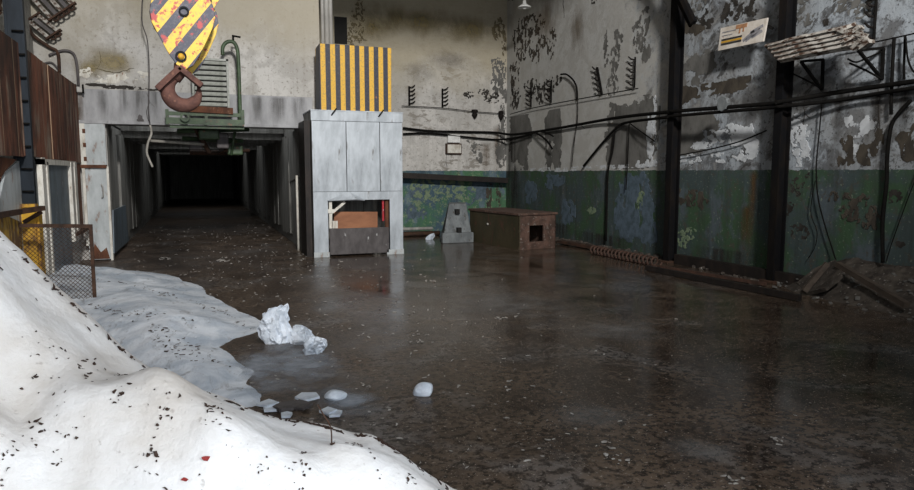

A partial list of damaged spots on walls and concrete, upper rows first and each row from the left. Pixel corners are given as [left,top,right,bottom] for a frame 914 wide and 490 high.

peeling [685,0,757,36]
peeling [796,0,875,27]
flaking render [682,48,752,105]
flaking render [463,6,661,247]
flaking render [680,114,759,164]
flaking render [837,115,914,167]